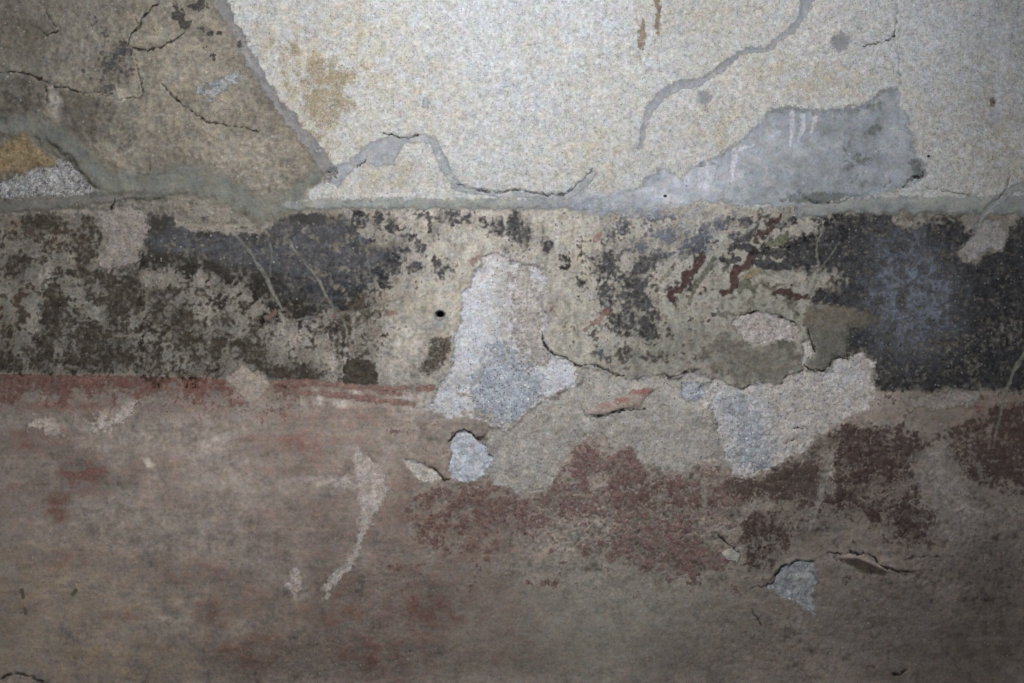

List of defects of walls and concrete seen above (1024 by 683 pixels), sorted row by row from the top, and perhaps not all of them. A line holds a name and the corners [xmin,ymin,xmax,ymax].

crack [8,3,259,132]
spalling [0,156,101,200]
flaking render [402,209,887,495]
spalling [759,559,817,615]
crack [828,550,915,573]